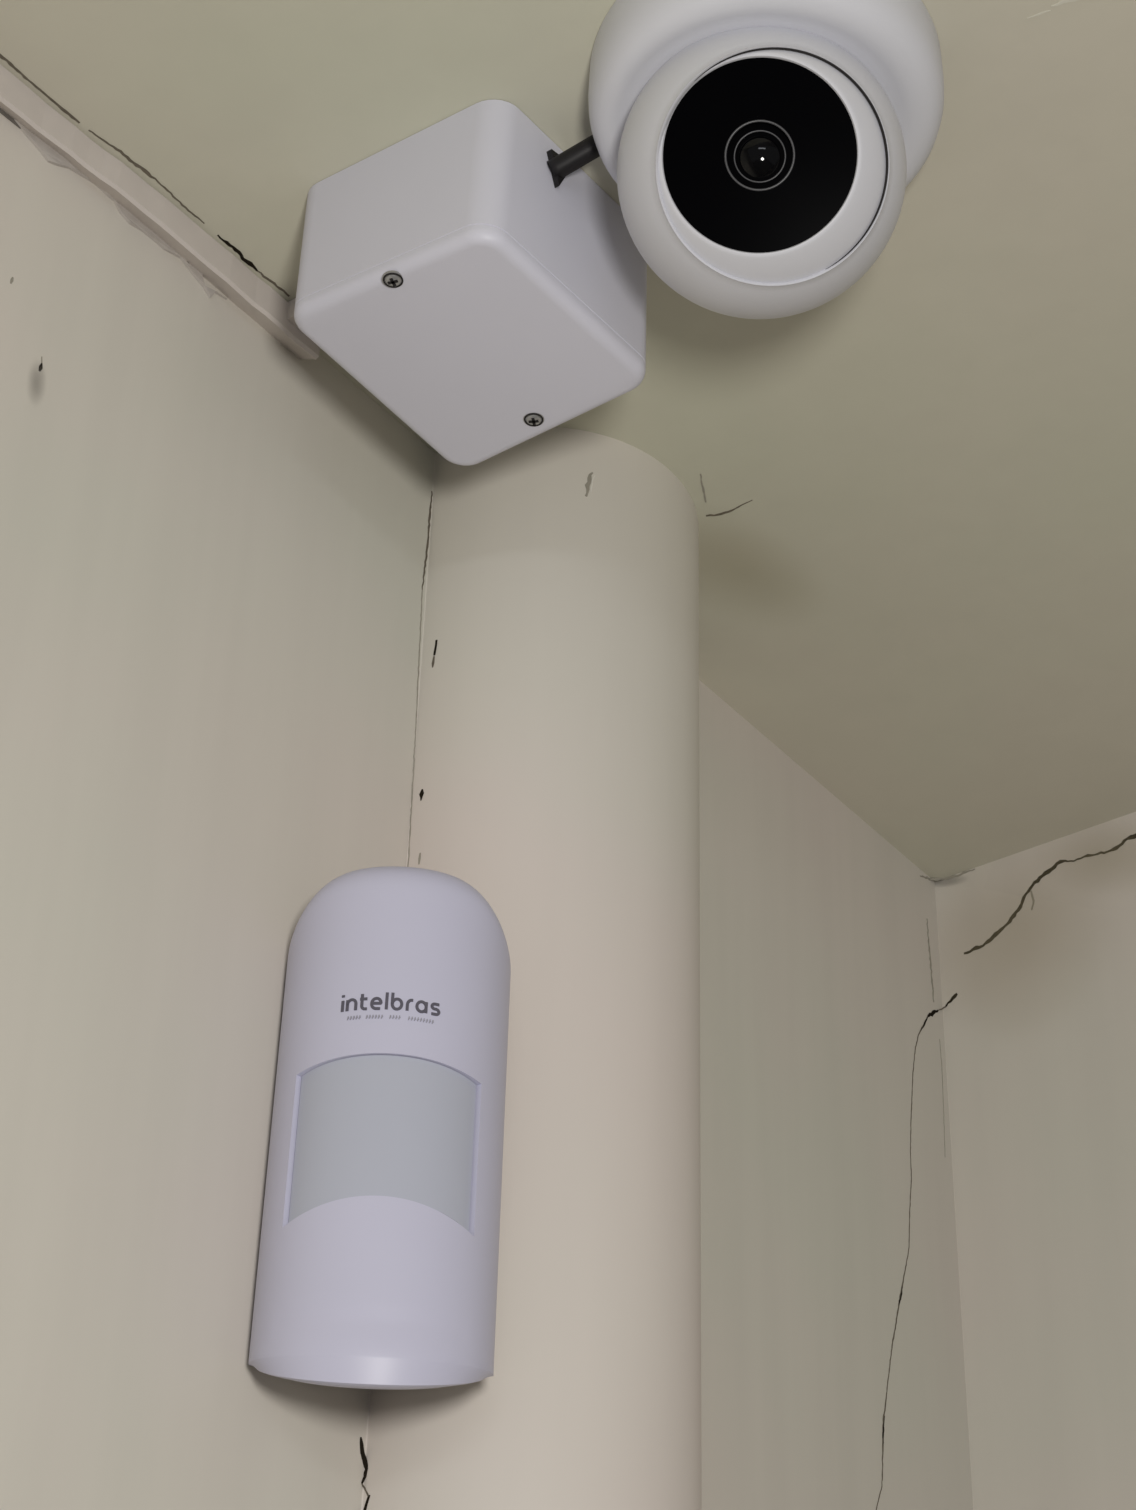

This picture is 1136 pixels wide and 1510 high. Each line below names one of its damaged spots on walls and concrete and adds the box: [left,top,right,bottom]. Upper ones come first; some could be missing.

crack [0,54,290,297]
crack [876,833,1136,1510]